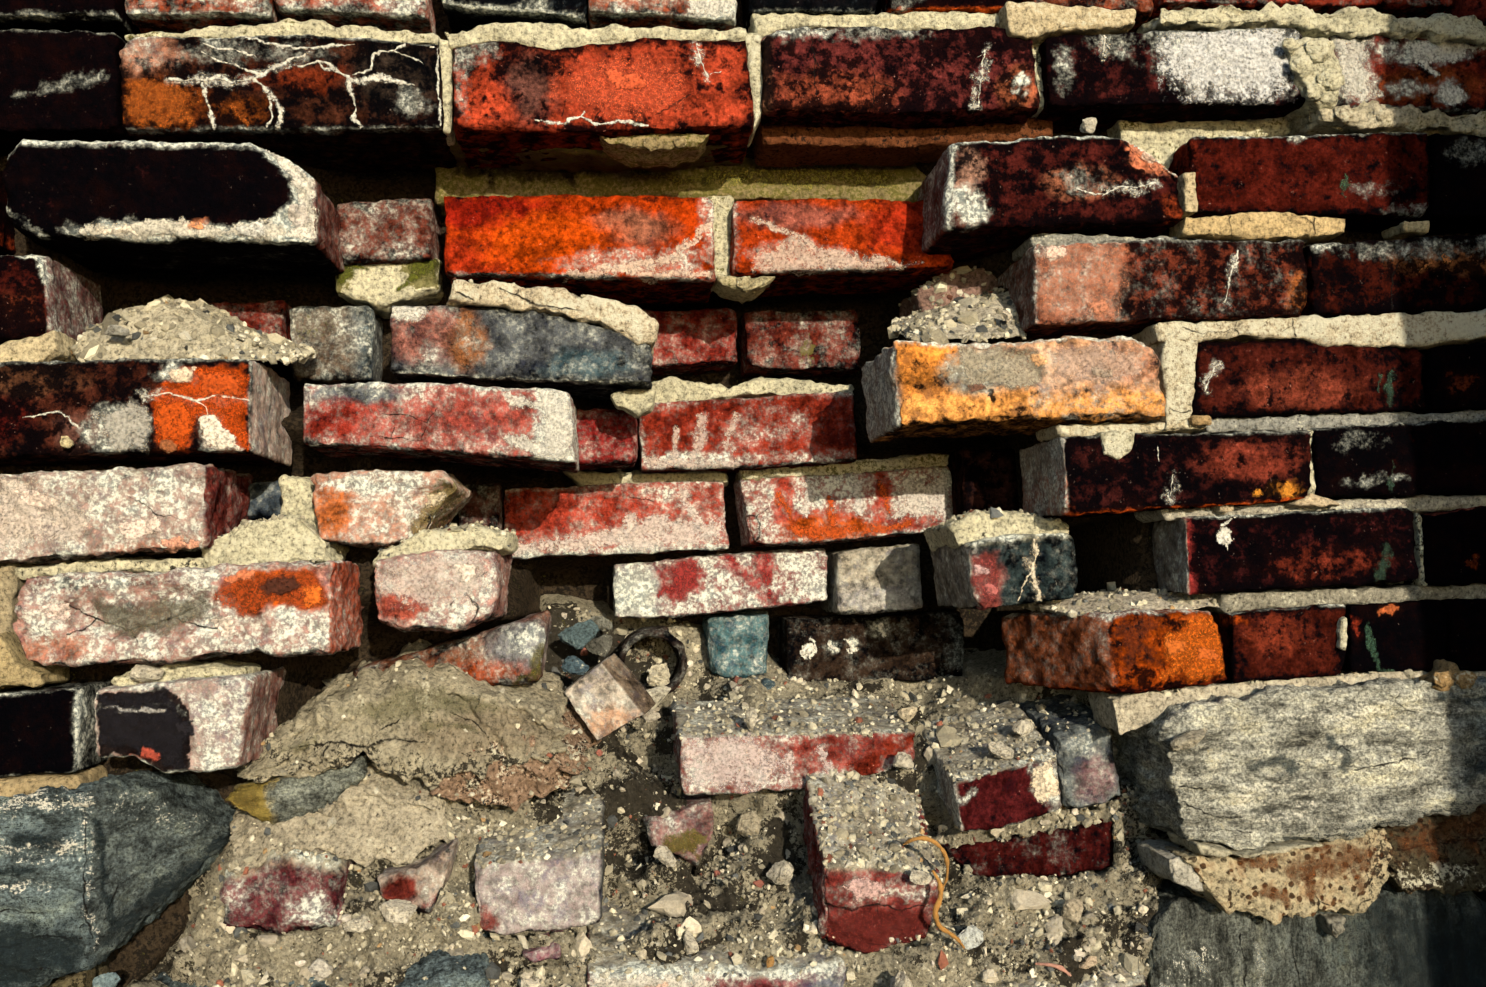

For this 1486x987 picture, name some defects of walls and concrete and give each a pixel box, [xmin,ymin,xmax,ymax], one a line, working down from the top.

crack [168,36,441,131]
leakage [1157,28,1296,105]
crack [26,411,79,429]
crack [141,392,249,415]
peeling [970,558,999,602]
spalling [558,616,613,675]
spalling [761,678,775,690]
peeling [1032,760,1060,802]
spalling [822,878,930,952]
spalling [588,973,715,987]